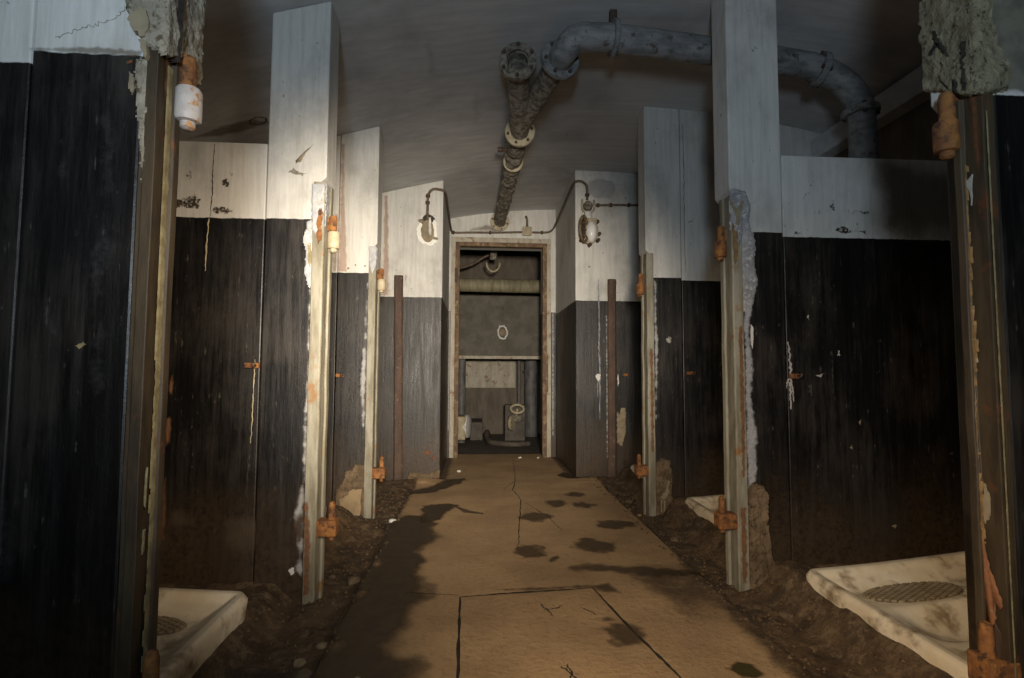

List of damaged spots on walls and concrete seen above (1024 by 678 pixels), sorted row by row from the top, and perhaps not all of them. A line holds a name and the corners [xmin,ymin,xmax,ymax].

spalling [917,0,1012,97]
crack [205,144,215,271]
peeling [289,168,330,288]
spalling [125,0,206,672]
spalling [729,188,776,589]
spalling [335,464,365,517]
crack [505,461,559,546]
corrosion [982,536,1003,658]